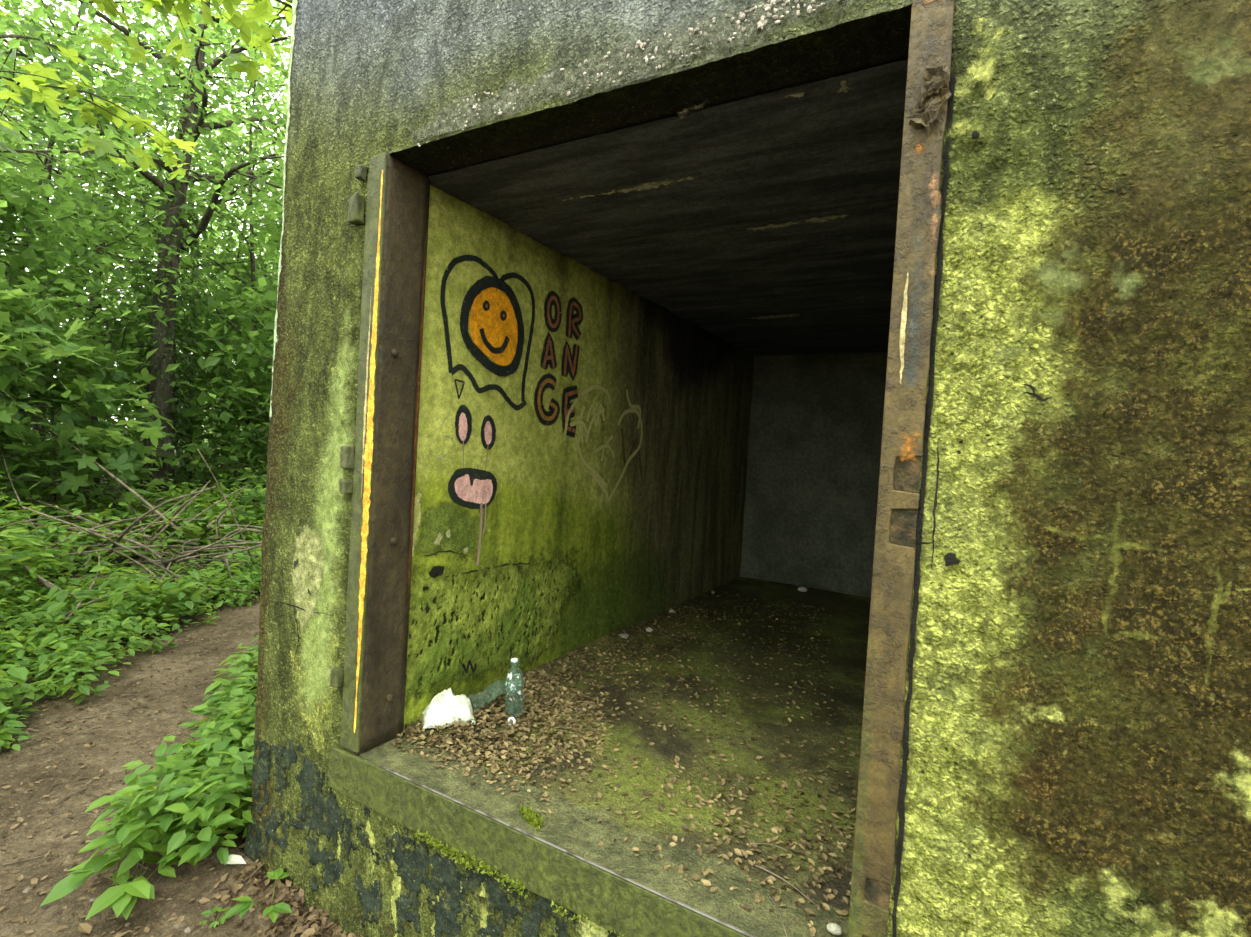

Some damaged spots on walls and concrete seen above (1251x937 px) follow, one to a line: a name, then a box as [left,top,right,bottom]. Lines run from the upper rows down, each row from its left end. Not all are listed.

damp [971,176,1251,937]
damp [366,819,401,937]
damp [479,881,491,937]
damp [580,917,619,937]